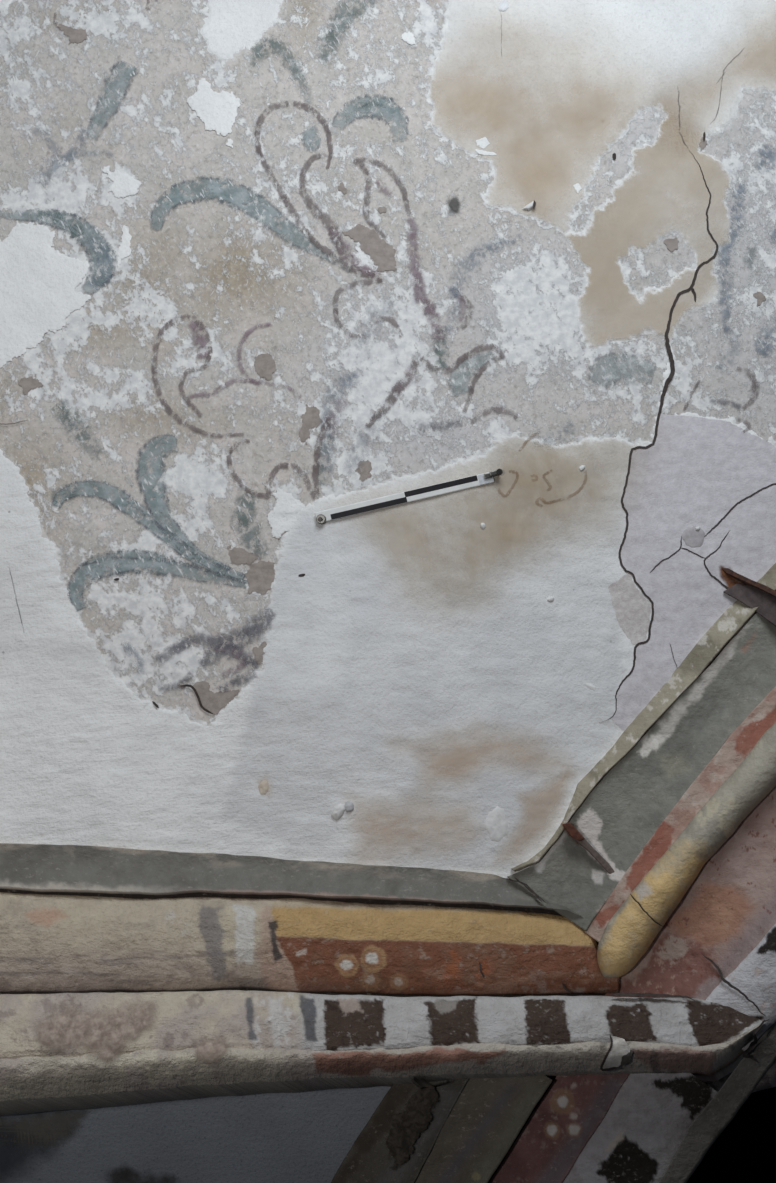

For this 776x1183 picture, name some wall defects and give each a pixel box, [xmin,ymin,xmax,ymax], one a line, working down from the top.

leakage [440,81,613,214]
leakage [572,115,728,341]
peeling [0,0,776,726]
leakage [462,441,601,573]
crack [602,115,776,722]